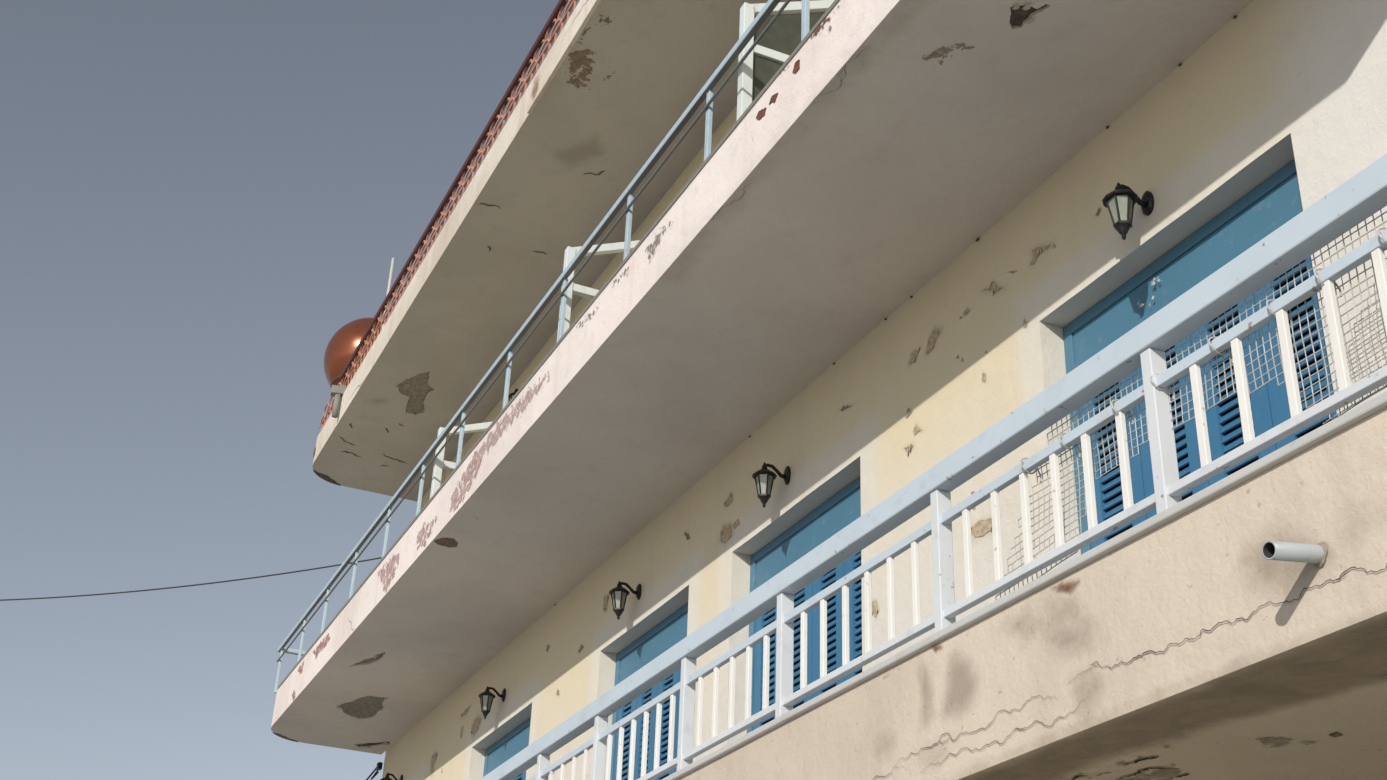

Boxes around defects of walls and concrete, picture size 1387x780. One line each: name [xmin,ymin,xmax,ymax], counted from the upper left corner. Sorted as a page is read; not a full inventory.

spalling [1010,4,1047,26]
peeling [557,15,614,90]
peeling [922,40,975,65]
spalling [396,372,433,416]
peeling [416,371,550,549]
peeling [378,553,399,592]
crack [873,565,1387,779]
spalling [337,696,385,718]